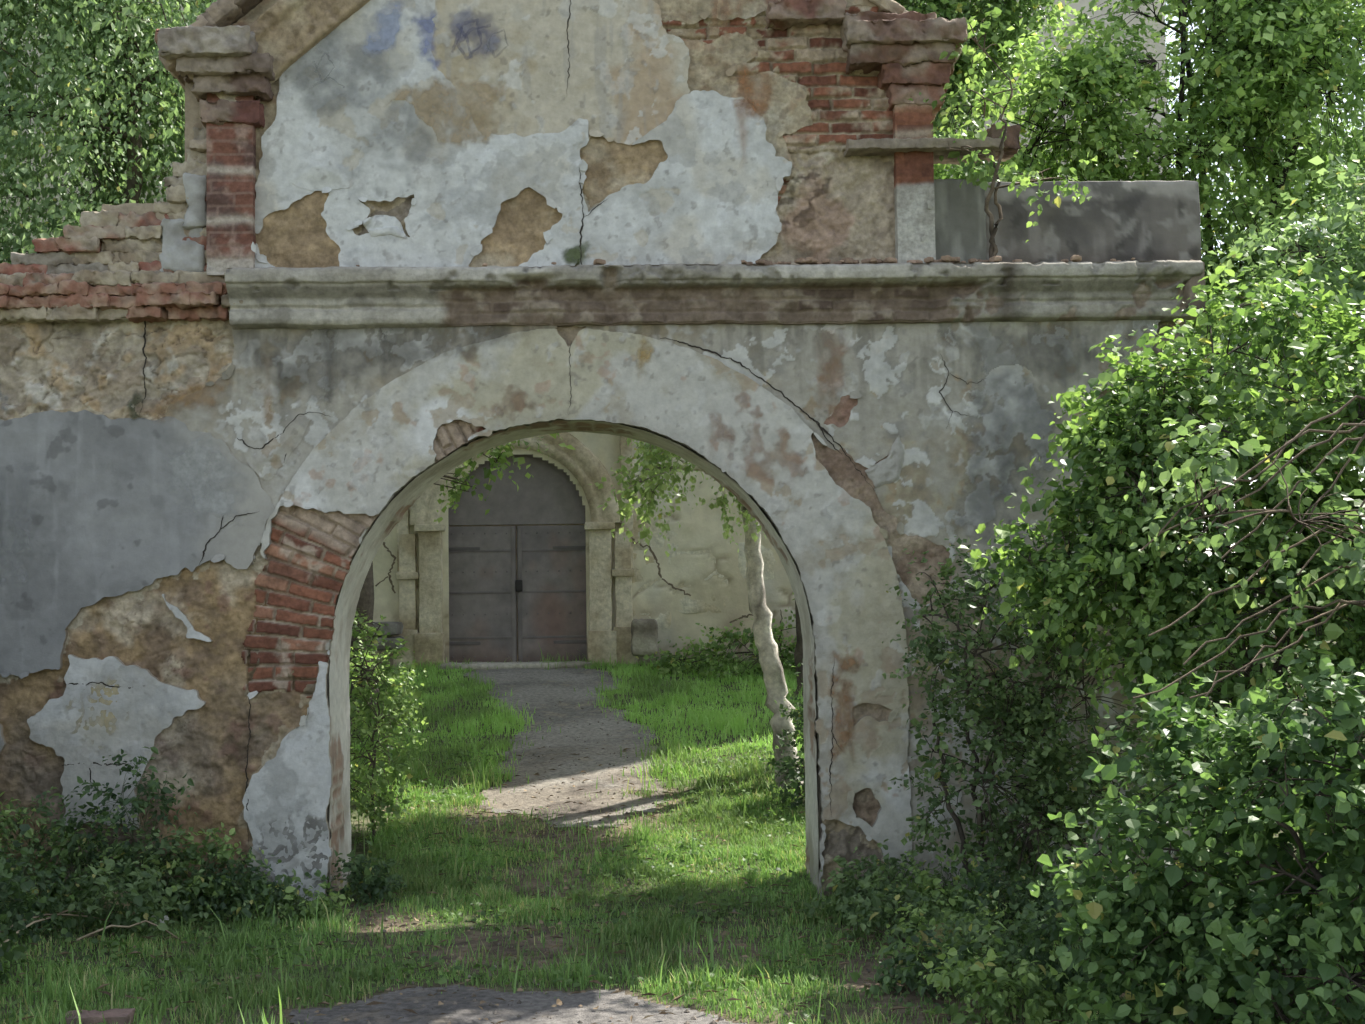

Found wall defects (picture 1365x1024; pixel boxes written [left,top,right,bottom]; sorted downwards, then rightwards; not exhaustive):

flaking render [0,501,379,903]